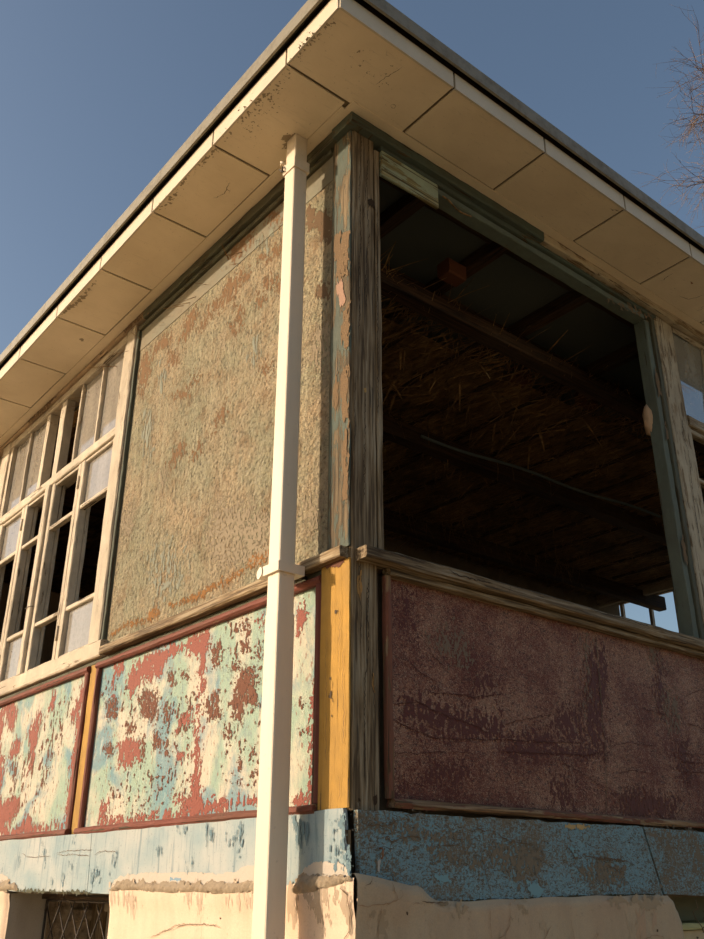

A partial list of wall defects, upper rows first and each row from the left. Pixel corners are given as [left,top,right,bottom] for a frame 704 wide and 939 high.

peeling [118,493,141,554]
peeling [295,598,310,637]
peeling [97,611,265,826]
peeling [292,678,314,806]
peeling [396,636,615,812]
crack [341,880,447,939]
crack [363,817,531,939]
peeling [352,768,550,899]
crack [566,845,627,876]
peeling [557,845,664,898]